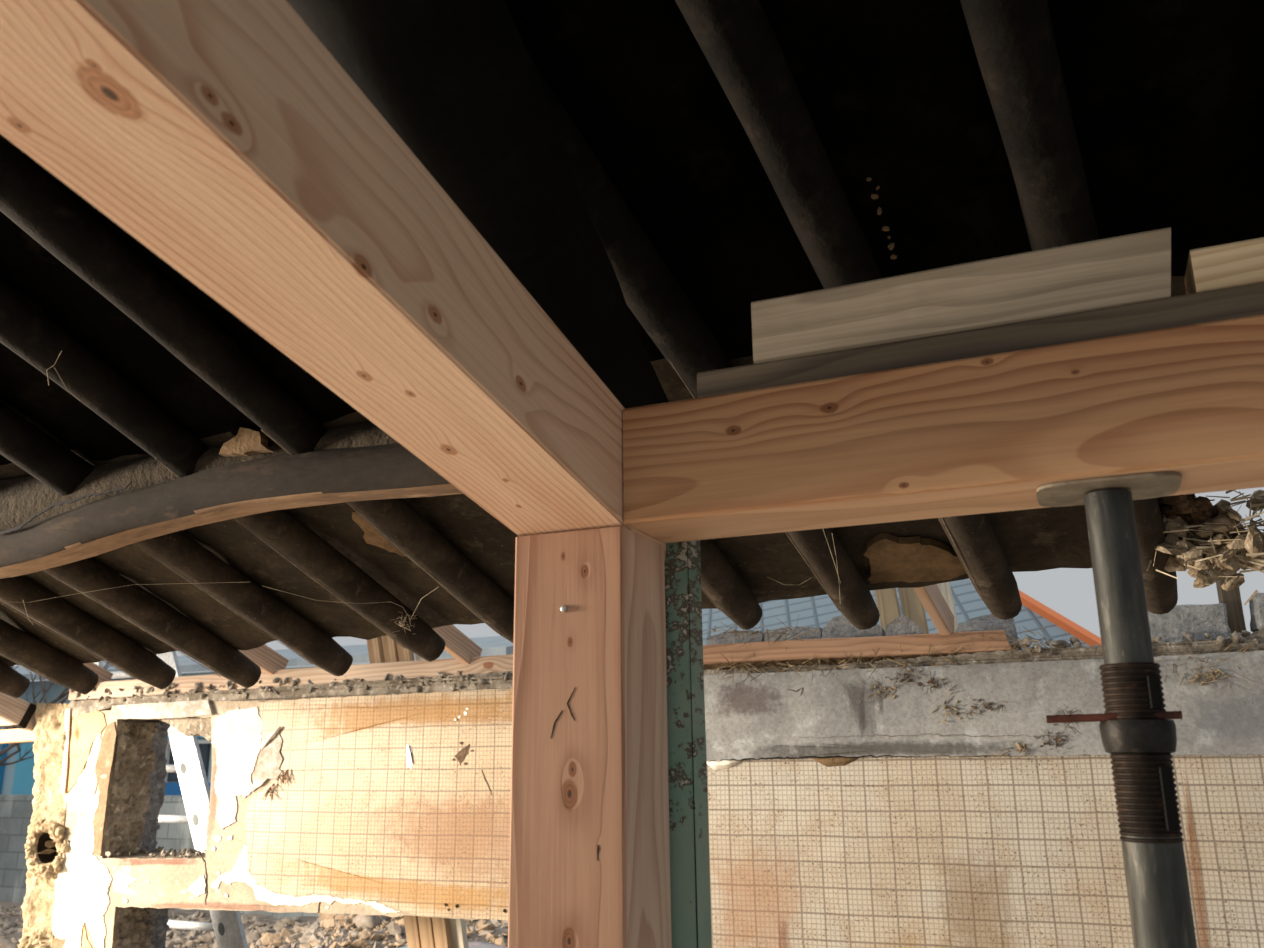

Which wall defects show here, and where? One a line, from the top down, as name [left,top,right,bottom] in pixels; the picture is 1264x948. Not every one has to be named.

spalling [17,703,150,948]
peeling [181,871,220,899]
peeling [211,707,289,851]